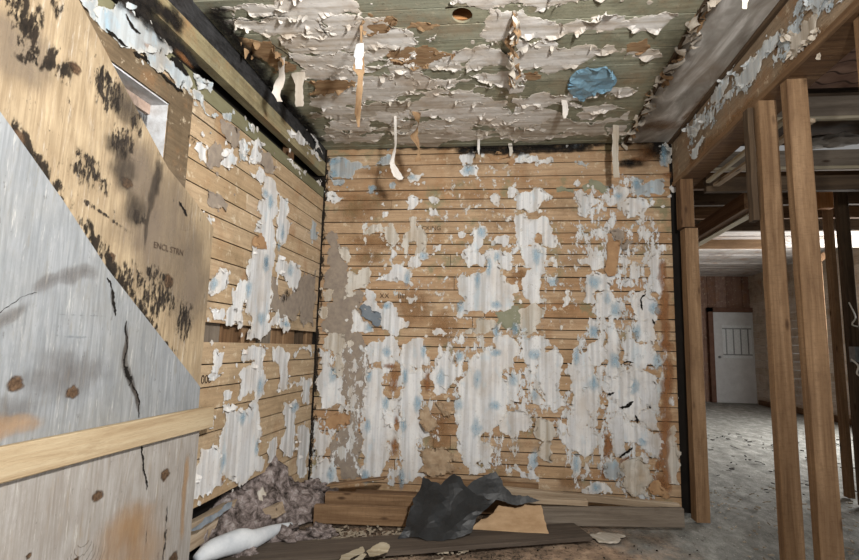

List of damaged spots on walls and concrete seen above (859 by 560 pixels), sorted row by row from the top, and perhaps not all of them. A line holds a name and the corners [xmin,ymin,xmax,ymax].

leakage [0,0,72,82]
peeling [682,0,843,160]
leakage [12,119,71,208]
leakage [70,150,108,196]
leakage [79,64,205,351]
peeling [80,0,681,506]
crack [107,277,140,414]
leakage [122,335,139,405]
crack [140,446,148,487]